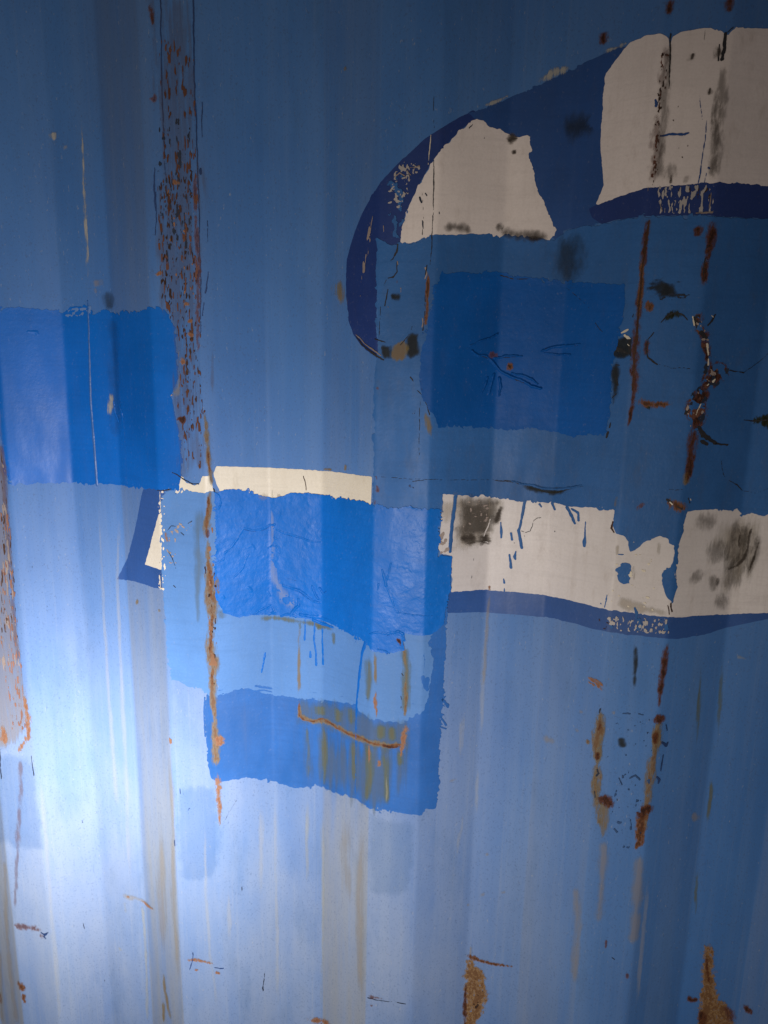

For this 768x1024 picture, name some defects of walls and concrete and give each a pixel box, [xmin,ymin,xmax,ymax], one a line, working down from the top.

peeling [658,105,714,214]
peeling [379,163,427,360]
corrosion [628,220,669,425]
corrosion [694,225,717,282]
corrosion [151,40,225,764]
corrosion [0,458,34,776]
peeling [599,588,673,634]
corrosion [298,658,407,799]
corrosion [586,709,614,833]
corrosion [635,647,669,849]
corrosion [462,955,512,1024]
corrosion [687,946,752,1024]